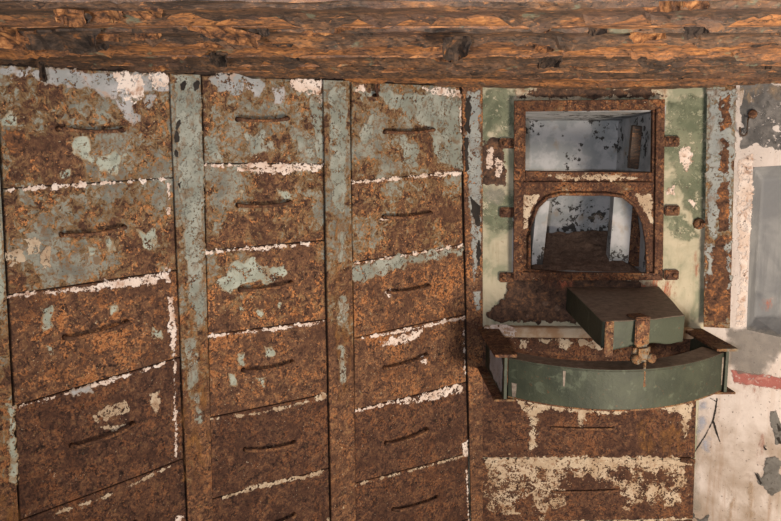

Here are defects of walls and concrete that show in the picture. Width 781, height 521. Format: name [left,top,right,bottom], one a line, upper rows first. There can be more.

peeling [0,66,514,457]
rust [0,0,781,324]
peeling [523,194,540,229]
peeling [635,193,654,223]
peeling [665,83,781,289]
peeling [5,373,131,485]
peeling [483,383,693,521]
spalling [757,456,781,496]
spalling [764,411,781,447]